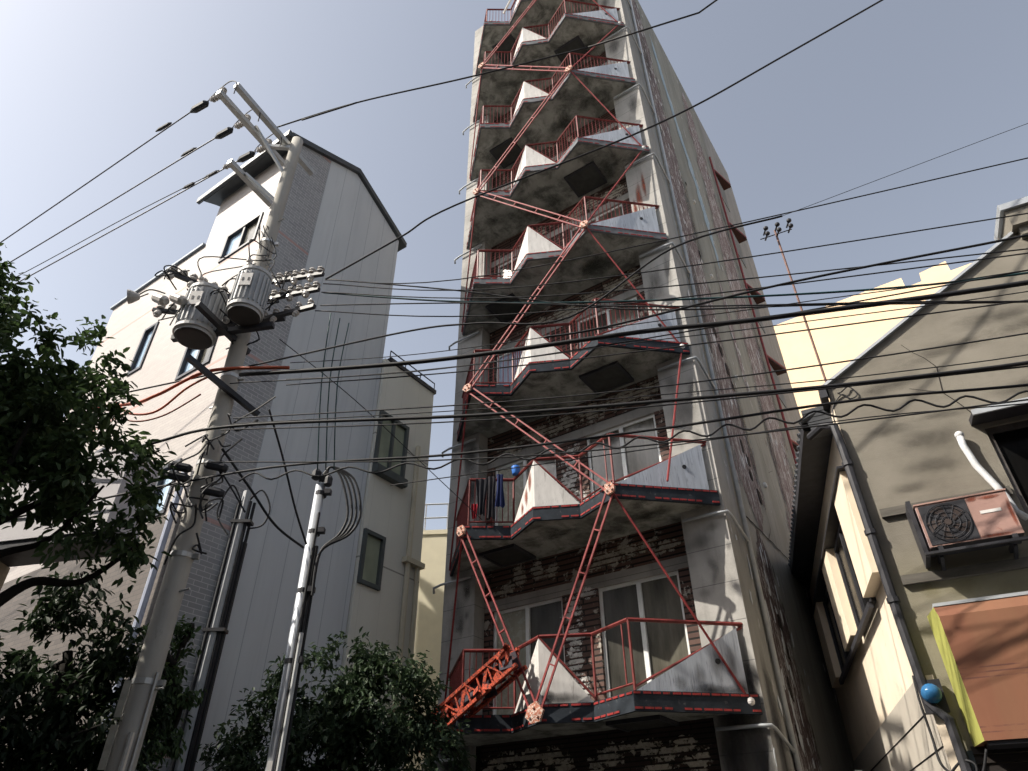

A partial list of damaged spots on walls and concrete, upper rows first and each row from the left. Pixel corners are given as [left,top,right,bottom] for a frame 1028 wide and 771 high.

peeling [585,534,684,573]
peeling [489,556,559,597]
peeling [560,585,600,694]
peeling [482,734,712,771]